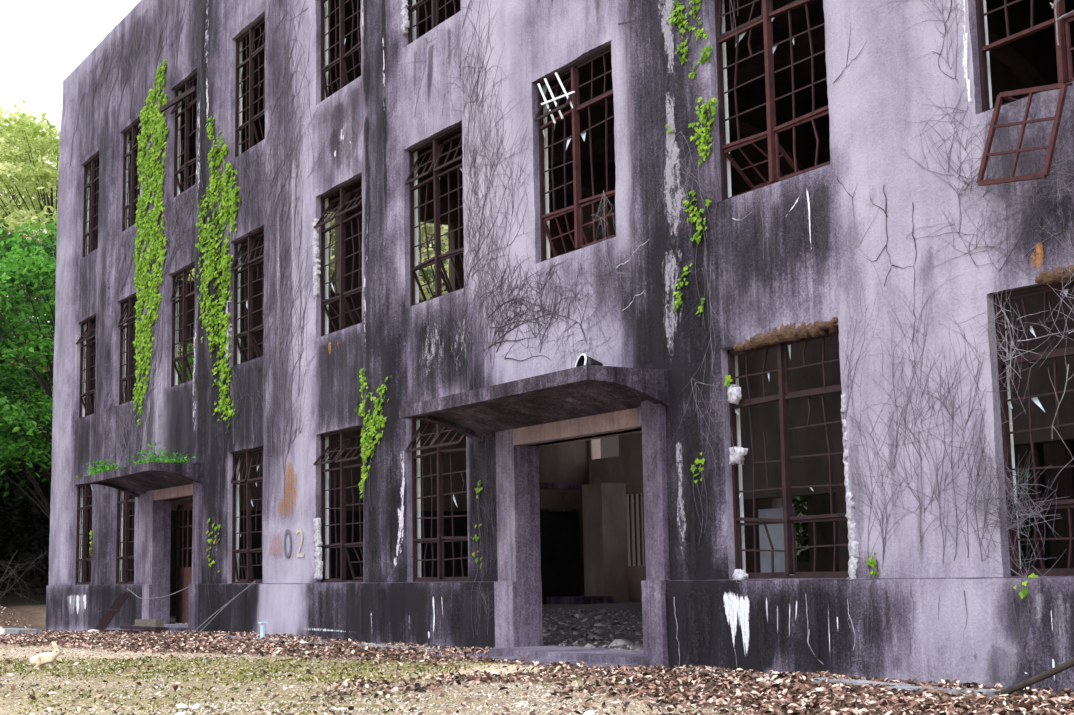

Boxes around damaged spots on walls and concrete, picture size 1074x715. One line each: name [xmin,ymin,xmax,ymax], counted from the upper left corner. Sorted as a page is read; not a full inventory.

peeling [658,0,675,72]
water stain [330,0,370,242]
peeling [664,93,685,236]
water stain [172,4,221,460]
peeling [665,253,682,347]
water stain [303,347,326,452]
peeling [676,442,686,548]
water stain [70,594,86,614]
water stain [428,592,460,638]
water stain [682,589,797,669]
water stain [813,589,838,662]